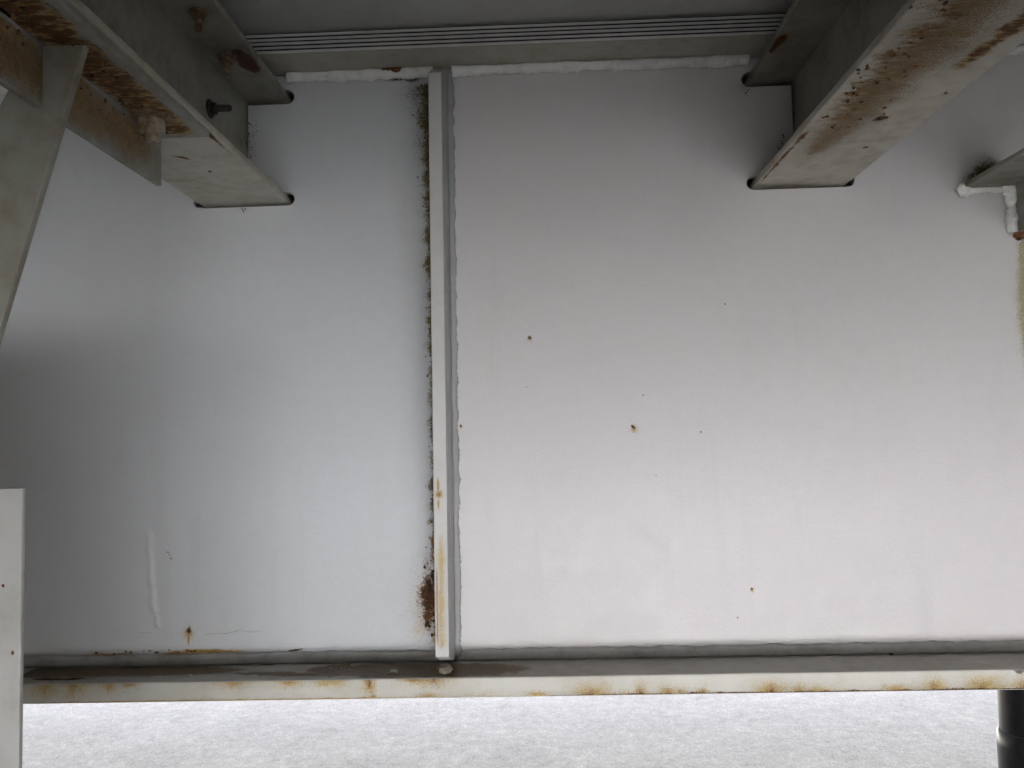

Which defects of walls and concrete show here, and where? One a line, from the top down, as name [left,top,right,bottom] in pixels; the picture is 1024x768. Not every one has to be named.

rust [0,0,229,174]
rust [763,0,1024,180]
leakage [396,82,434,534]
rust [87,624,260,656]
rust [402,478,447,649]
rust [28,671,1024,703]